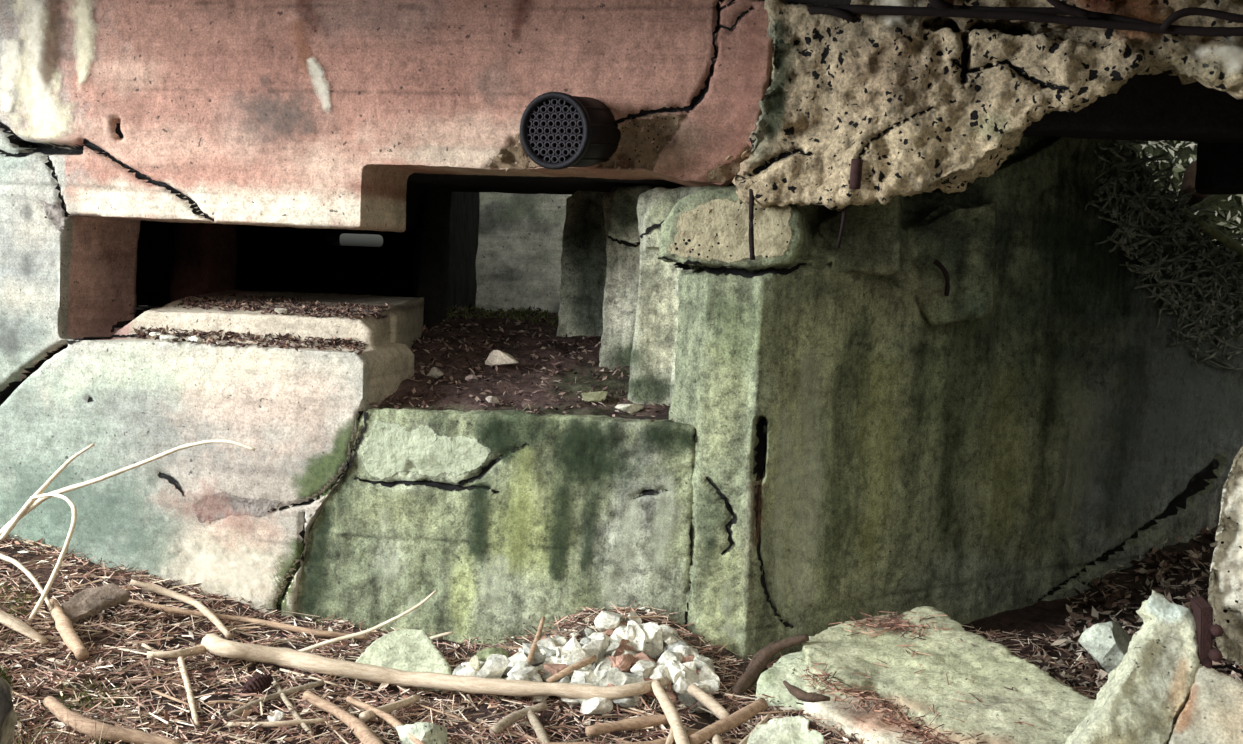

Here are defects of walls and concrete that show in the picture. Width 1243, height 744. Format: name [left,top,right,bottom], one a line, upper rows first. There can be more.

water stain [0,0,69,145]
water stain [71,0,93,83]
crack [616,0,753,124]
spalling [807,0,1243,37]
crack [0,122,214,222]
spalling [849,159,863,189]
crack [606,220,807,278]
crack [0,305,165,406]
crack [268,411,527,614]
water stain [470,485,486,560]
water stain [550,487,597,579]
crack [684,419,794,628]